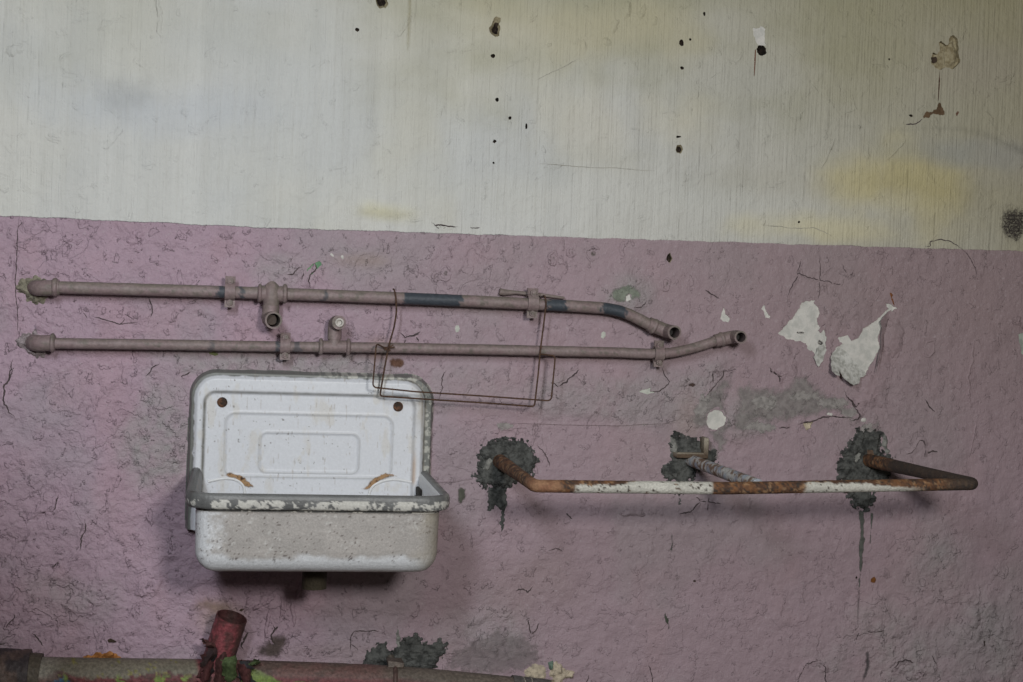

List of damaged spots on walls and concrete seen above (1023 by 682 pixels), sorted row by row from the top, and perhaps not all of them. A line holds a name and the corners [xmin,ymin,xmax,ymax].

spalling [931,35,960,100]
rust [906,103,959,125]
leakage [1003,209,1023,241]
peeling [778,293,898,385]
peeling [706,410,726,430]
crack [793,658,829,682]
crack [893,655,937,672]